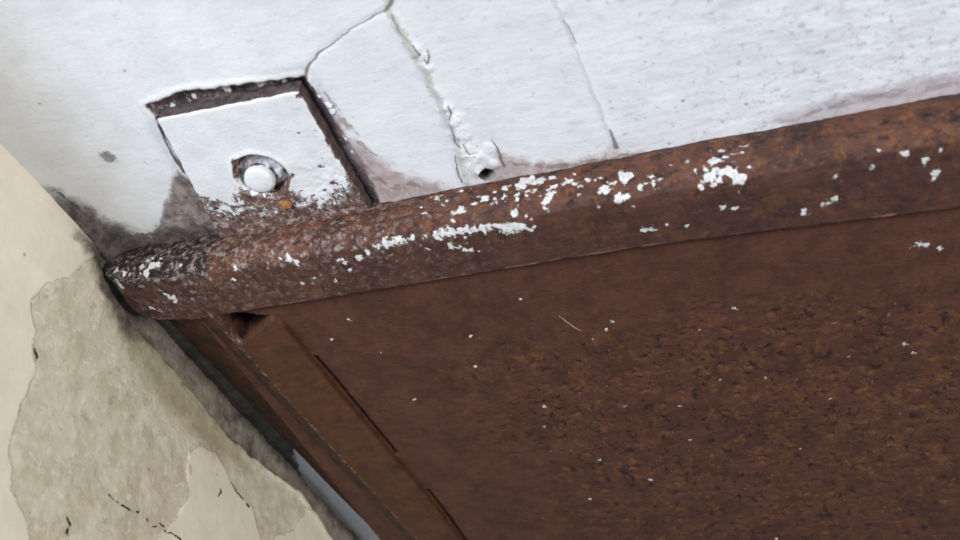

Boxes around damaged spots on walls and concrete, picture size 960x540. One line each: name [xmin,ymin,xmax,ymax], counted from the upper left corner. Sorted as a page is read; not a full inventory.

leakage [54,190,215,345]
corrosion [154,174,218,235]
corrosion [322,100,441,203]
crack [304,0,505,183]
corrosion [486,157,576,183]
crack [553,0,619,149]
corrosion [783,76,960,123]
peeling [7,257,359,540]